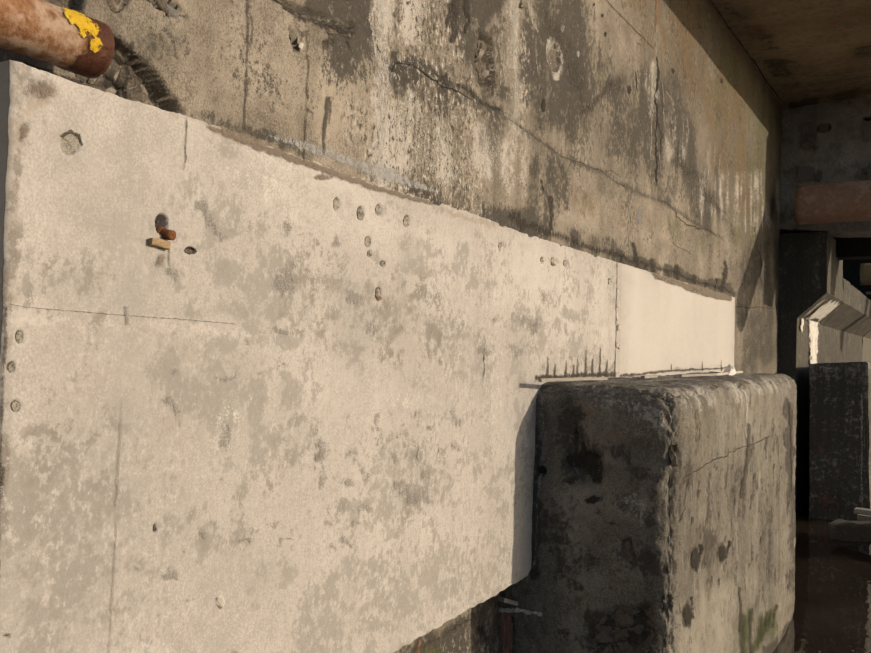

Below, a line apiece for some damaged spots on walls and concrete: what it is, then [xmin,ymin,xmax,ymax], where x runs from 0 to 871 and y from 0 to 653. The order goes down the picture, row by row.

spalling [146,0,181,19]
spalling [475,39,494,84]
crack [505,115,623,186]
crack [635,58,716,236]
damp [541,179,554,231]
damp [620,242,656,274]
damp [692,260,728,292]
spalling [562,421,603,484]
crack [680,436,770,521]